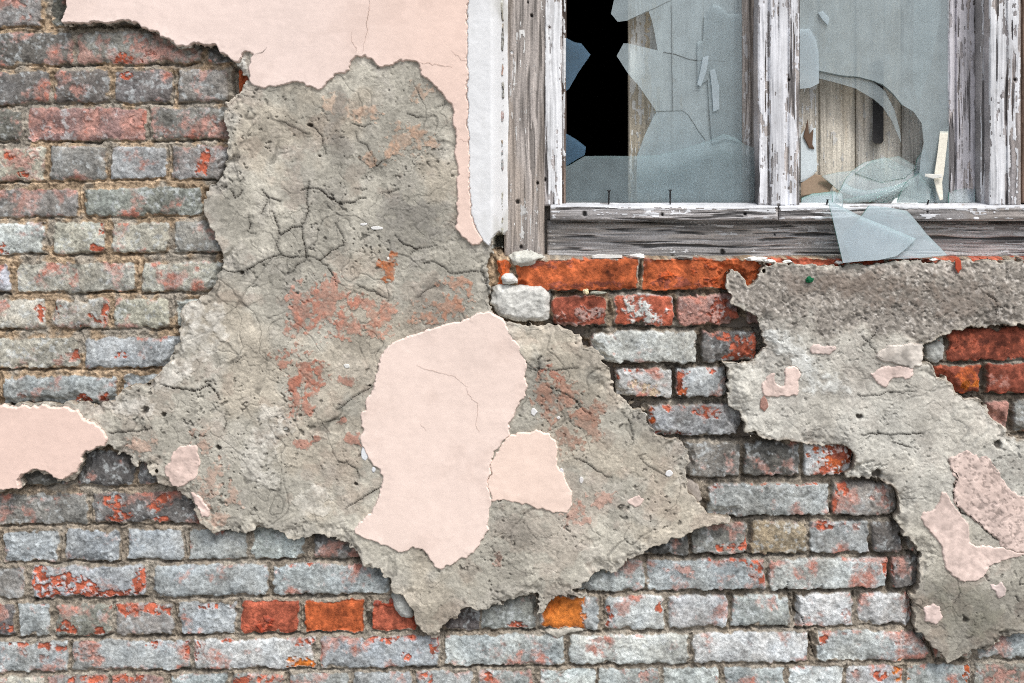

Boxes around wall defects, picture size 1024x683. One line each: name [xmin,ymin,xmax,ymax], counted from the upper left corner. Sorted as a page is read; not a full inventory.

spalling [1,111,71,177]
crack [226,188,381,296]
peeling [354,0,1024,570]
peeling [0,191,392,583]
spalling [0,619,144,683]
spalling [32,559,172,617]
spalling [198,593,504,683]
spalling [520,568,645,643]
spalling [625,510,786,612]
spalling [796,444,1024,683]